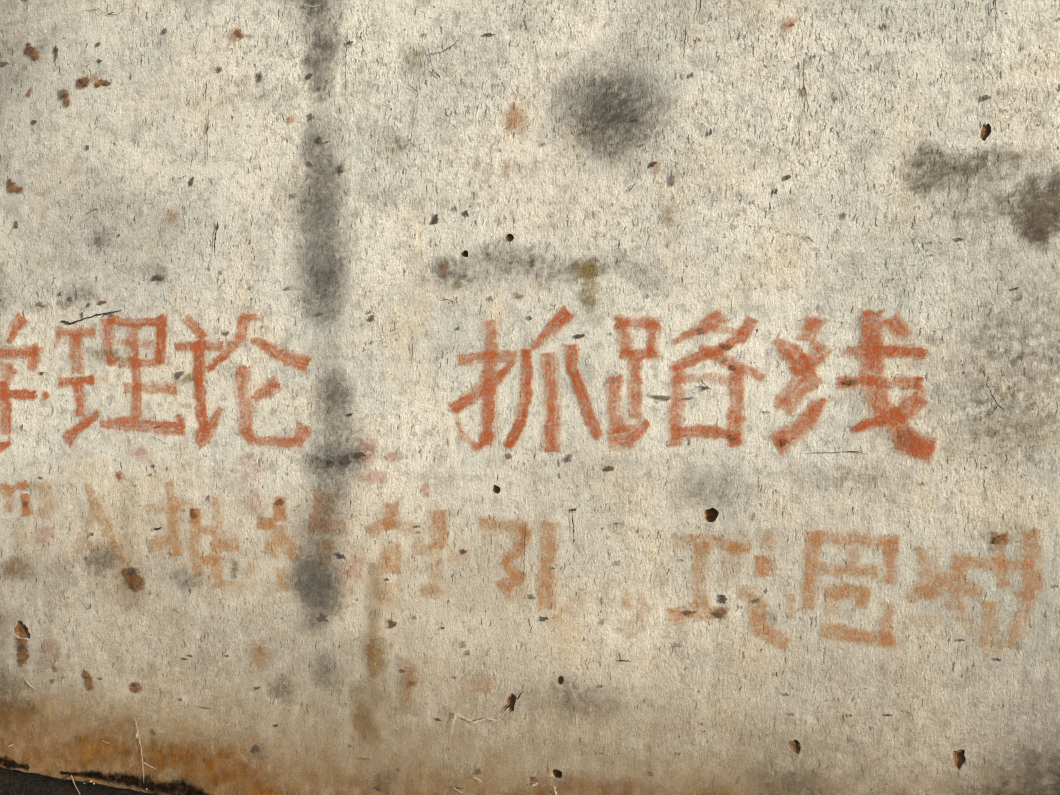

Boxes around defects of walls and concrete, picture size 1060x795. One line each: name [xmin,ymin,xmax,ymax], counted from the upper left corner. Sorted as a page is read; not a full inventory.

leakage [301,133,345,321]
leakage [908,145,1060,244]
leakage [295,380,360,624]
flaking render [14,620,30,667]
leakage [0,565,798,795]